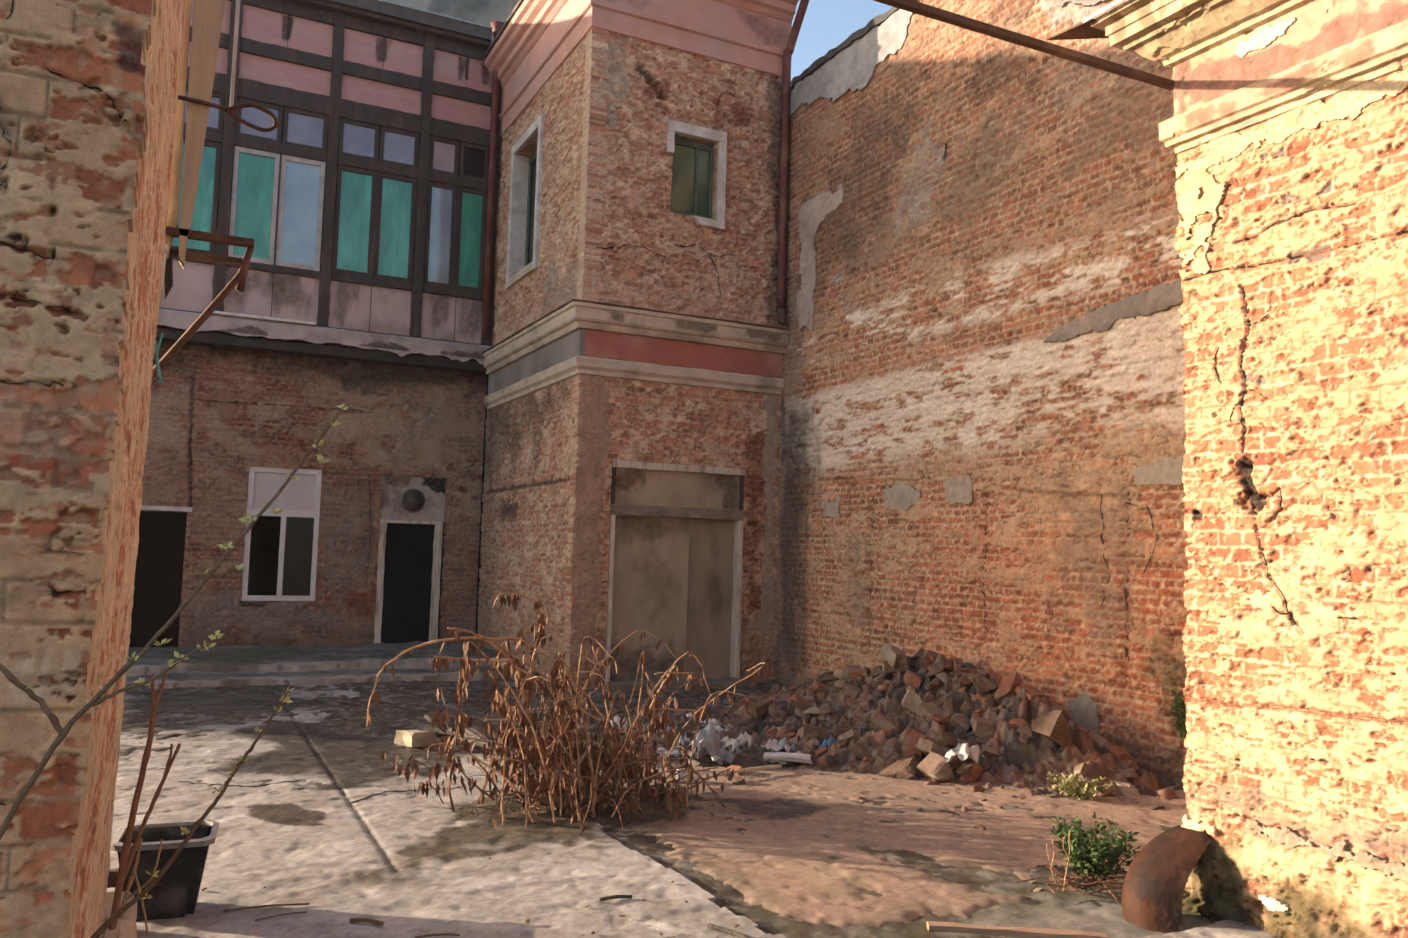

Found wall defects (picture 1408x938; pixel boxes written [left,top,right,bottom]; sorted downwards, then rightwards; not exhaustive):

peeling [1173,0,1408,127]
crack [46,68,126,122]
crack [0,241,55,259]
crack [0,379,82,387]
crack [1184,203,1408,631]
peeling [1132,456,1184,486]
peeling [882,481,922,511]
peeling [944,477,975,505]
crack [44,589,86,597]